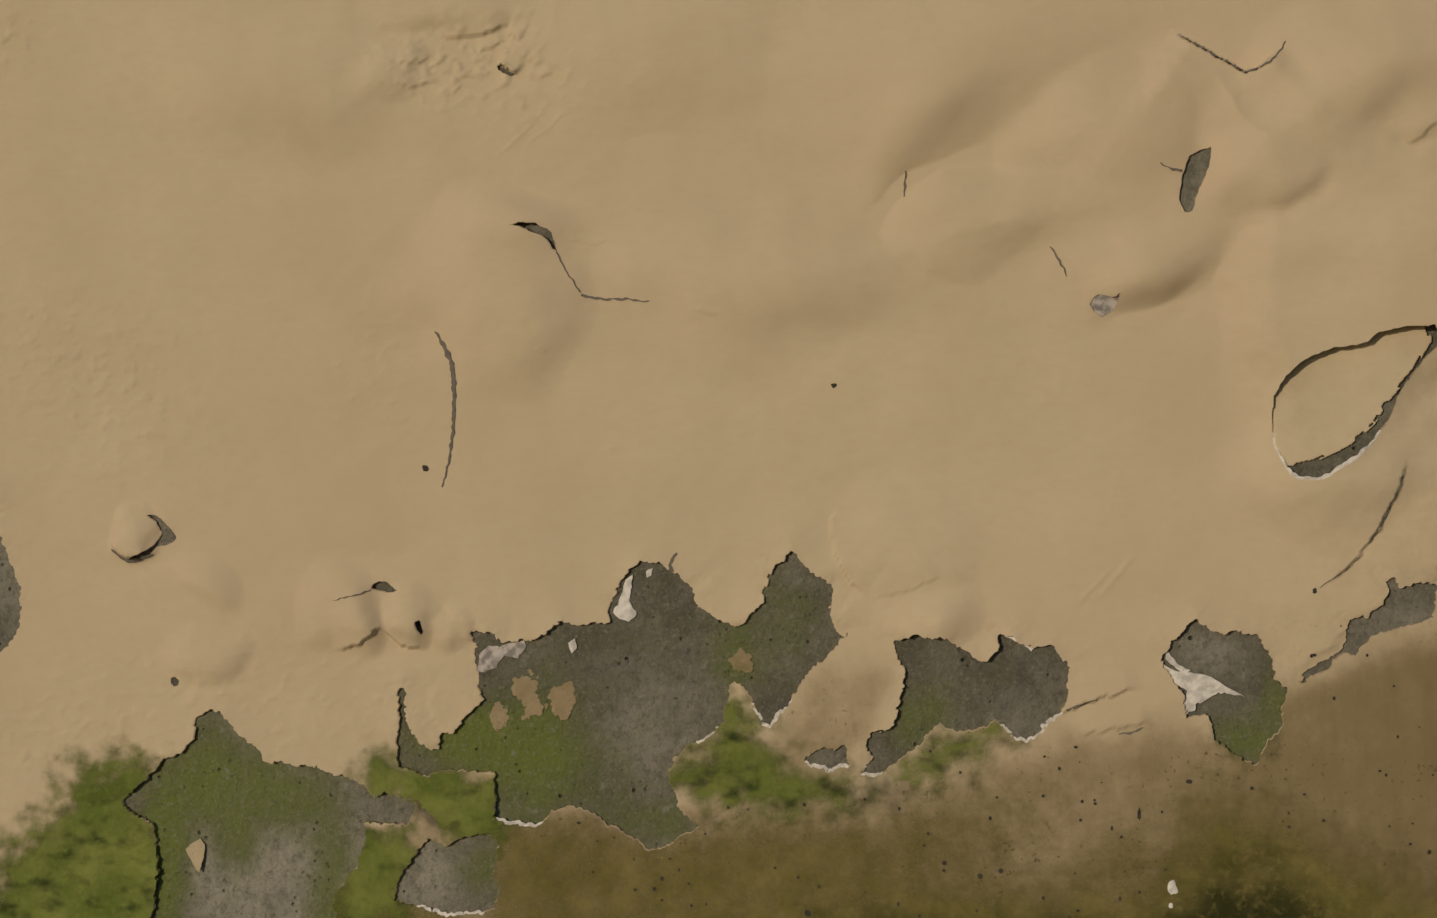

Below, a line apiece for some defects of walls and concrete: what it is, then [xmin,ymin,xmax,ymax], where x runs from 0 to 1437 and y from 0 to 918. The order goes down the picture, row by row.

crack [1179,35,1286,73]
peeling [1179,147,1211,212]
crack [556,252,649,302]
crack [434,331,456,487]
peeling [1287,324,1437,478]
peeling [0,537,22,652]
peeling [130,515,176,559]
crack [1320,470,1405,588]
peeling [396,551,848,850]
peeling [805,634,1070,773]
peeling [1161,577,1437,765]
peeling [124,709,416,918]